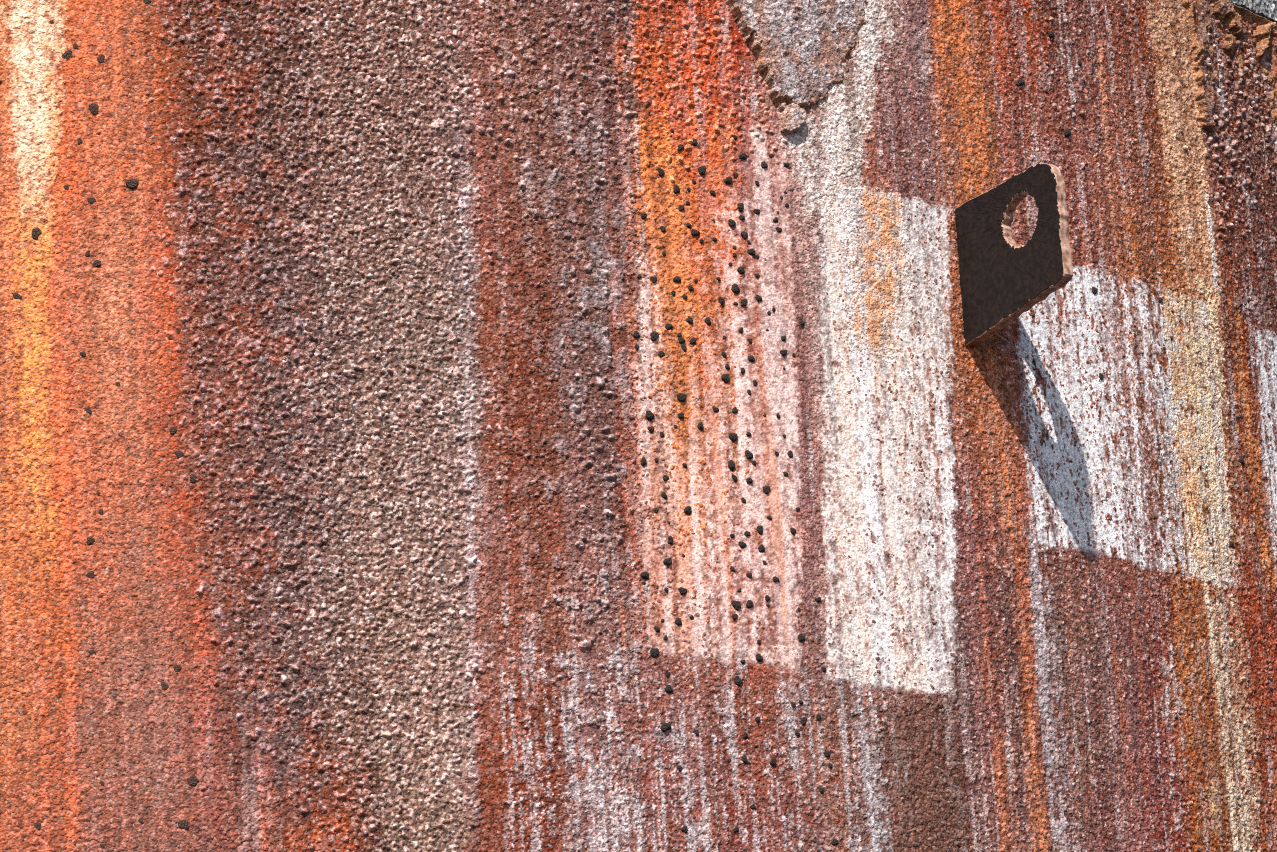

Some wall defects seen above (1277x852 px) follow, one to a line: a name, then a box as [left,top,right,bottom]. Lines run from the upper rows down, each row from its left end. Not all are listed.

corrosion [61,43,79,60]
corrosion [1037,0,1123,323]
peeling [1182,0,1277,131]
corrosion [1193,0,1277,257]
corrosion [0,364,97,852]
corrosion [143,0,796,852]
corrosion [1225,274,1277,852]